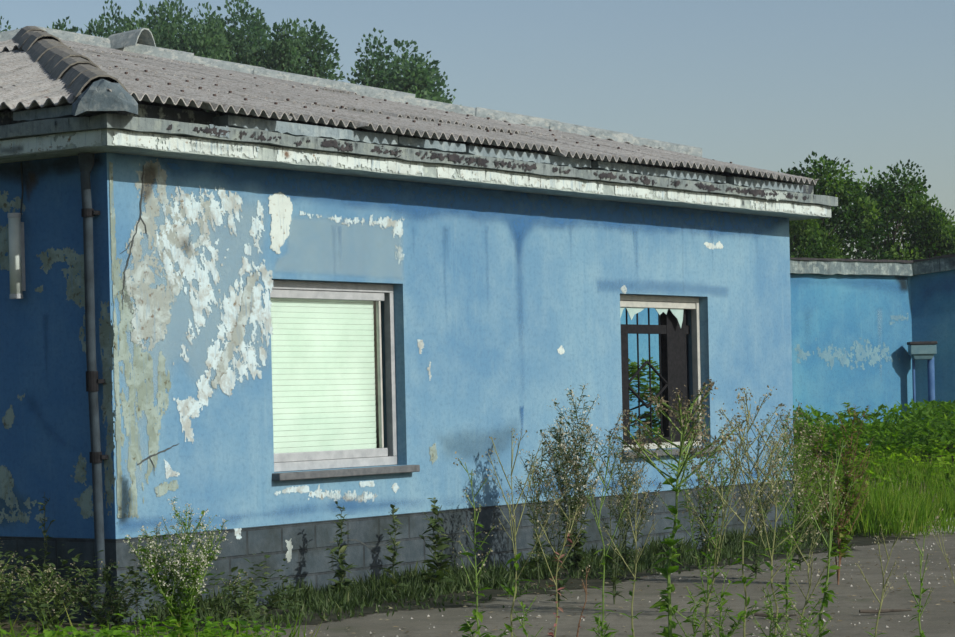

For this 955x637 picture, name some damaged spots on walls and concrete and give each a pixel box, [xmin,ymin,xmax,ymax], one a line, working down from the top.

crack [120,165,148,303]
peeling [0,104,827,524]
crack [137,444,178,475]